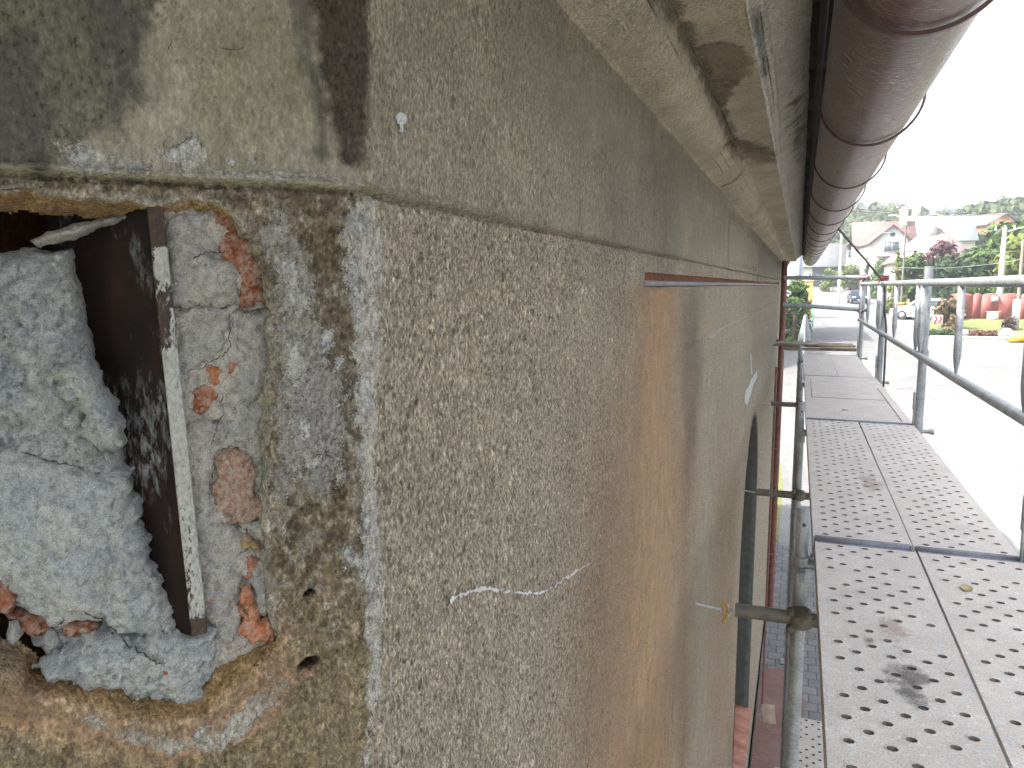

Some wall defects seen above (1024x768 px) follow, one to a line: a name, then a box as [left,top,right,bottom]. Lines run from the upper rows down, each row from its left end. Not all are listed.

damp [0,0,370,190]
damp [662,0,738,147]
spalling [0,210,126,253]
spalling [164,207,280,668]
spalling [0,580,103,655]